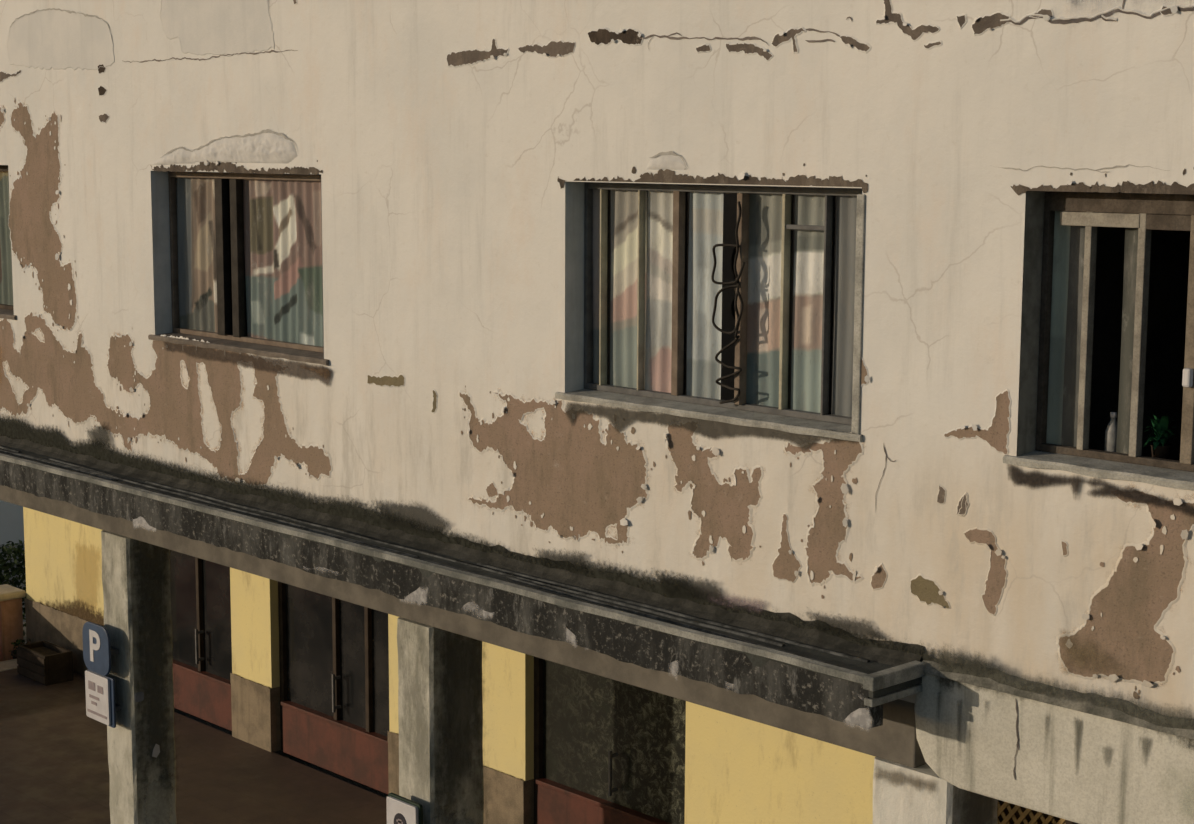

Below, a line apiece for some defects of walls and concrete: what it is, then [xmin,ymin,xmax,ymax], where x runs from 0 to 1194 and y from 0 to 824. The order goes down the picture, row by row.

flaking render [446,27,644,68]
flaking render [696,26,807,61]
flaking render [840,35,872,54]
crack [1000,0,1194,25]
flaking render [0,100,333,486]
flaking render [944,389,1012,455]
flaking render [458,386,764,565]
flaking render [772,432,888,599]
water stain [404,587,426,603]
water stain [702,595,762,612]
flaking render [1056,486,1194,699]
crack [1012,699,1020,780]